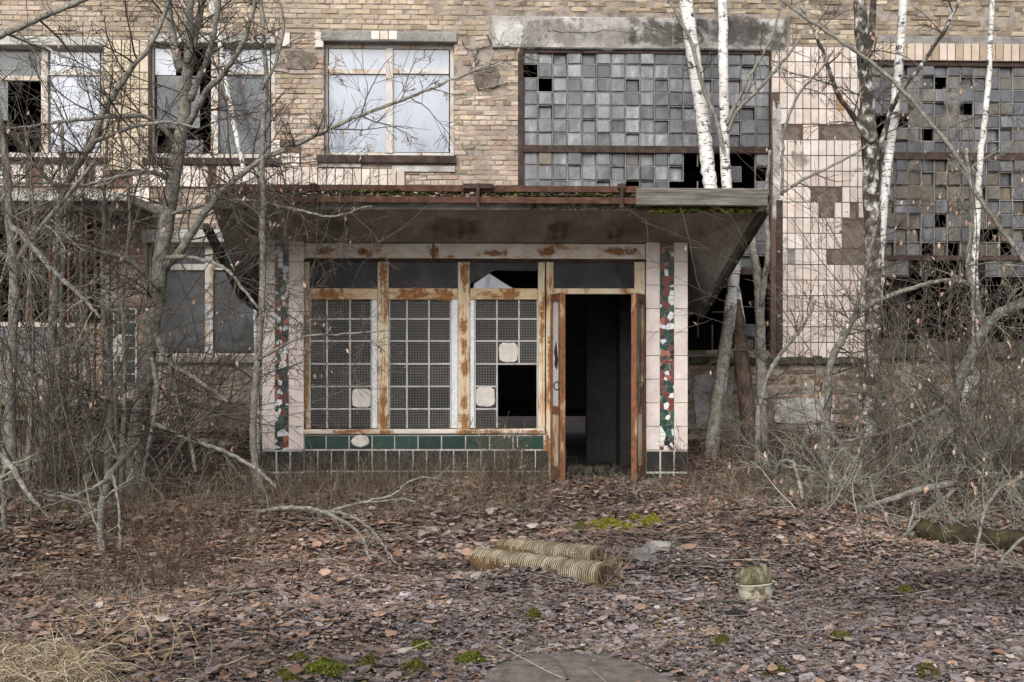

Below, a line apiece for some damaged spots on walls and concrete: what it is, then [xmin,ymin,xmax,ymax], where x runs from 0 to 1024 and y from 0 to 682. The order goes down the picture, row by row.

water stain [520,19,577,46]
water stain [596,17,684,47]
water stain [697,15,792,51]
spalling [821,126,861,144]
spalling [811,188,864,265]
corrosion [605,247,640,256]
corrosion [459,318,467,376]
corrosion [379,385,392,434]
corrosion [457,395,474,434]